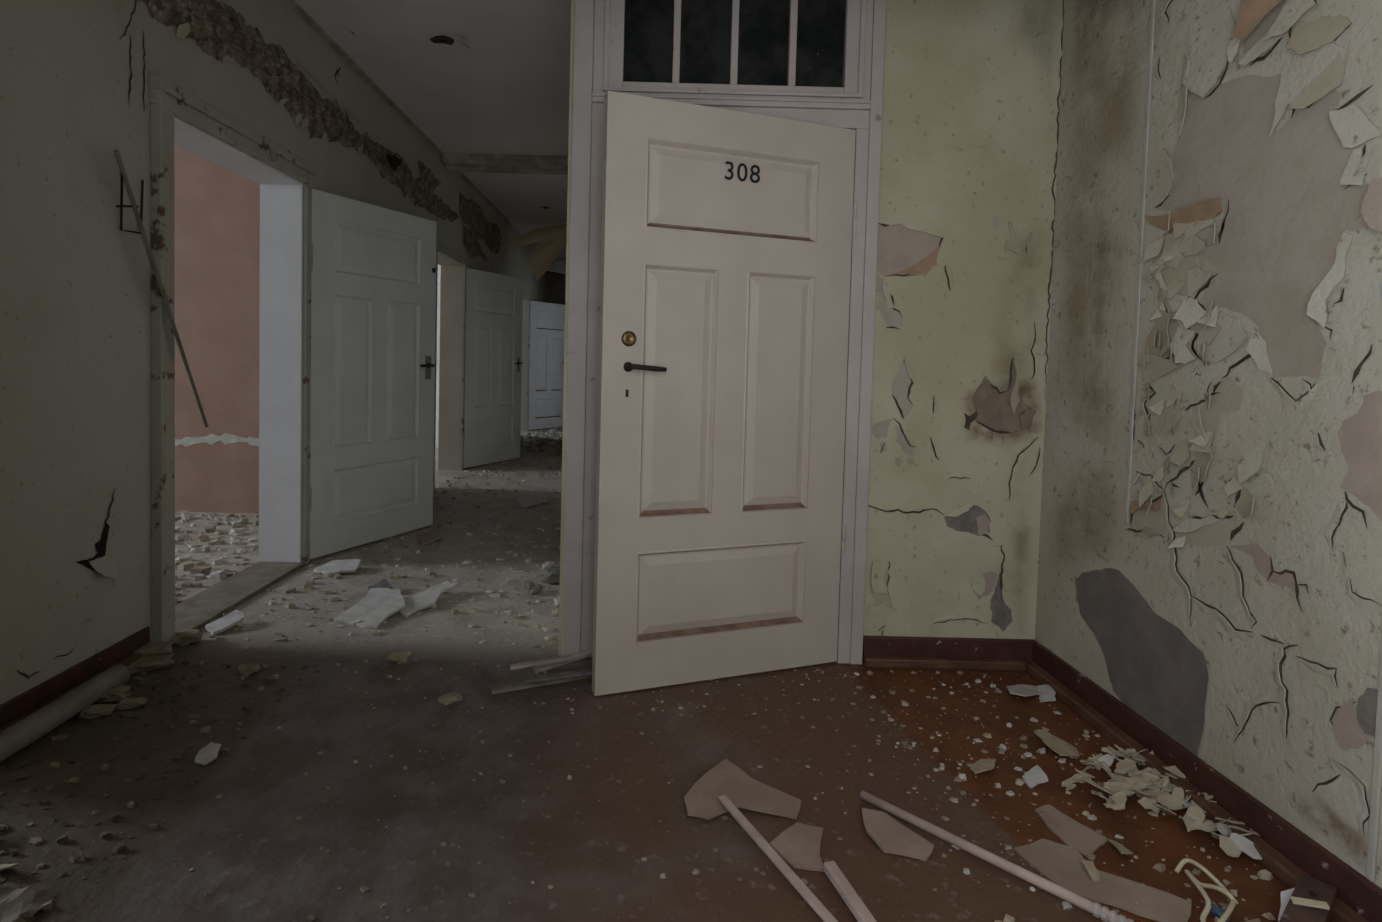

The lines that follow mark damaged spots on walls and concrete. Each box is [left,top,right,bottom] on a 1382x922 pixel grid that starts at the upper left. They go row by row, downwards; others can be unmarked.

flaking render [135,0,502,261]
peeling [876,215,948,330]
crack [945,265,954,291]
peeling [1125,0,1382,612]
peeling [964,355,1037,434]
crack [868,395,971,515]
crack [1008,437,1043,501]
flaking render [944,503,1012,631]
crack [1129,378,1370,835]
crack [1324,501,1382,609]